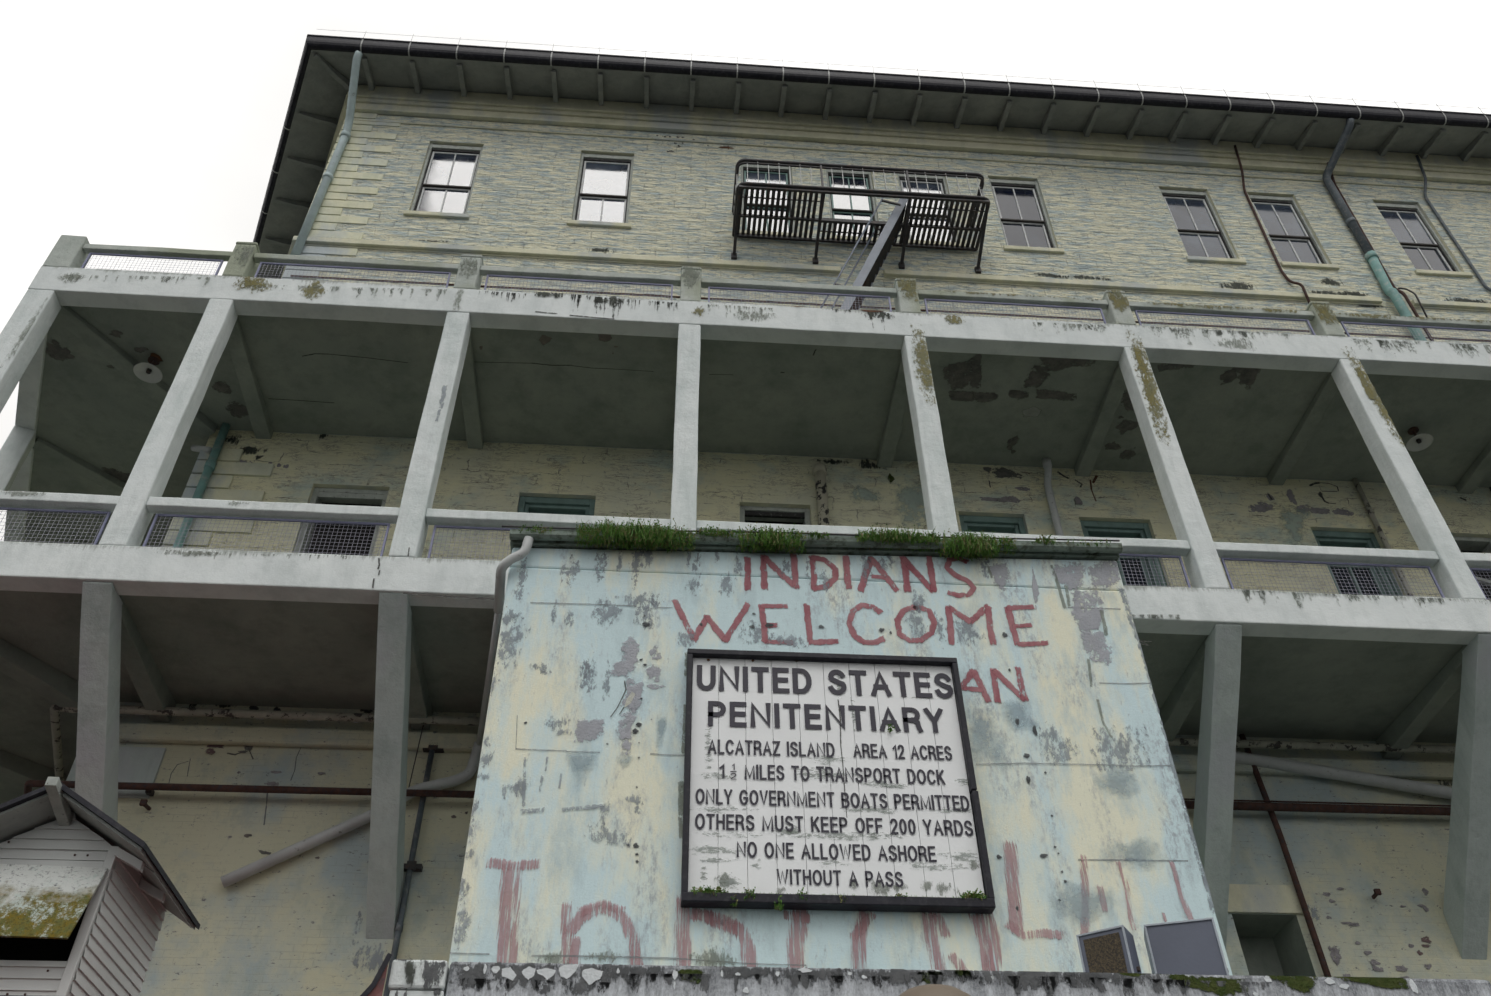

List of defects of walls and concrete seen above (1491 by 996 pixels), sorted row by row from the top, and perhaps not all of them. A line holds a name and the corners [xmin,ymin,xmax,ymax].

peeling [1053,561,1120,665]
peeling [574,615,665,759]
peeling [463,951,620,996]
peeling [672,949,749,993]